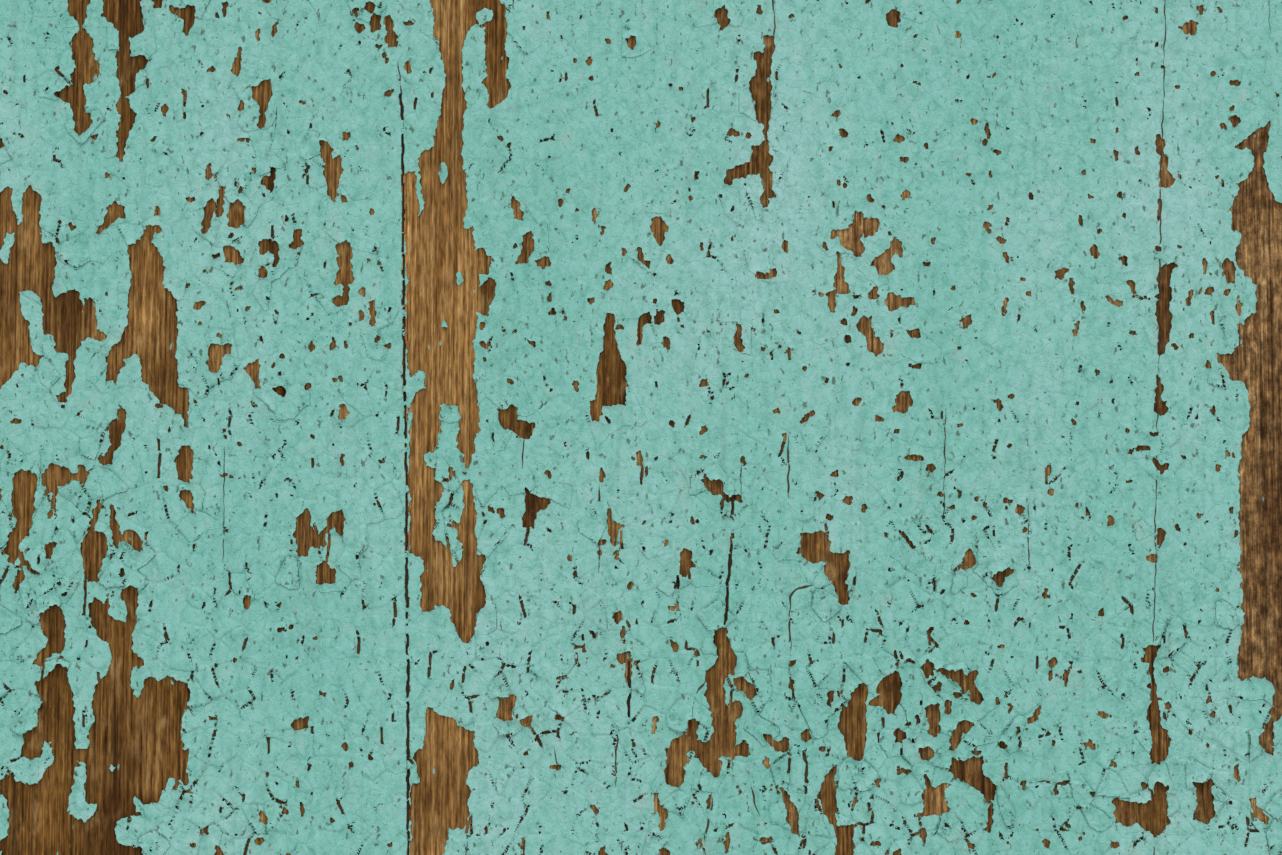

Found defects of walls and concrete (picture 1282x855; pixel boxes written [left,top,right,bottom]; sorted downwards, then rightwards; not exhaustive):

peeling [32,0,196,180]
peeling [0,405,218,855]
peeling [0,185,311,544]
crack [398,66,412,855]
peeling [299,0,573,736]
crack [615,661,631,787]
crack [673,575,681,603]
crack [721,544,735,628]
crack [784,437,792,497]
crack [788,585,812,648]
peeling [638,539,1041,855]
peeling [1105,105,1282,782]